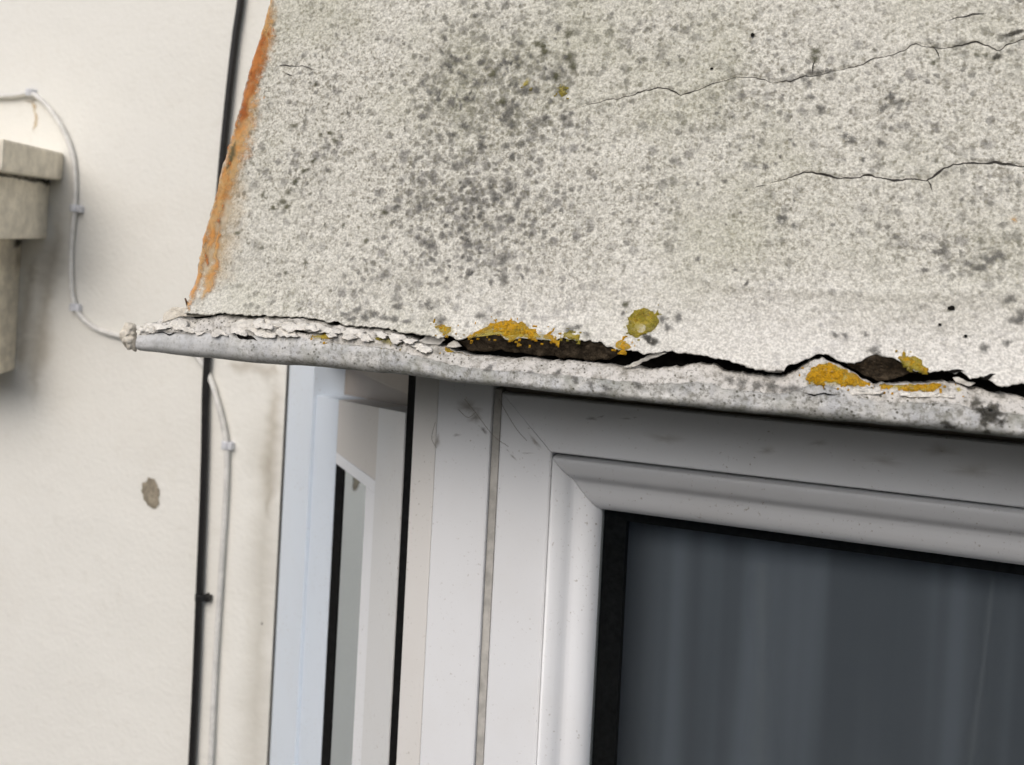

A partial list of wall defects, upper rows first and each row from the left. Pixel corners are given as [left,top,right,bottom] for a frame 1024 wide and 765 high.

mould [420,26,576,127]
crack [569,13,1023,112]
rust [188,0,276,310]
crack [757,161,1024,190]
mould [411,181,523,279]
crack [142,313,379,341]
peeling [136,307,665,368]
crack [410,333,1024,397]